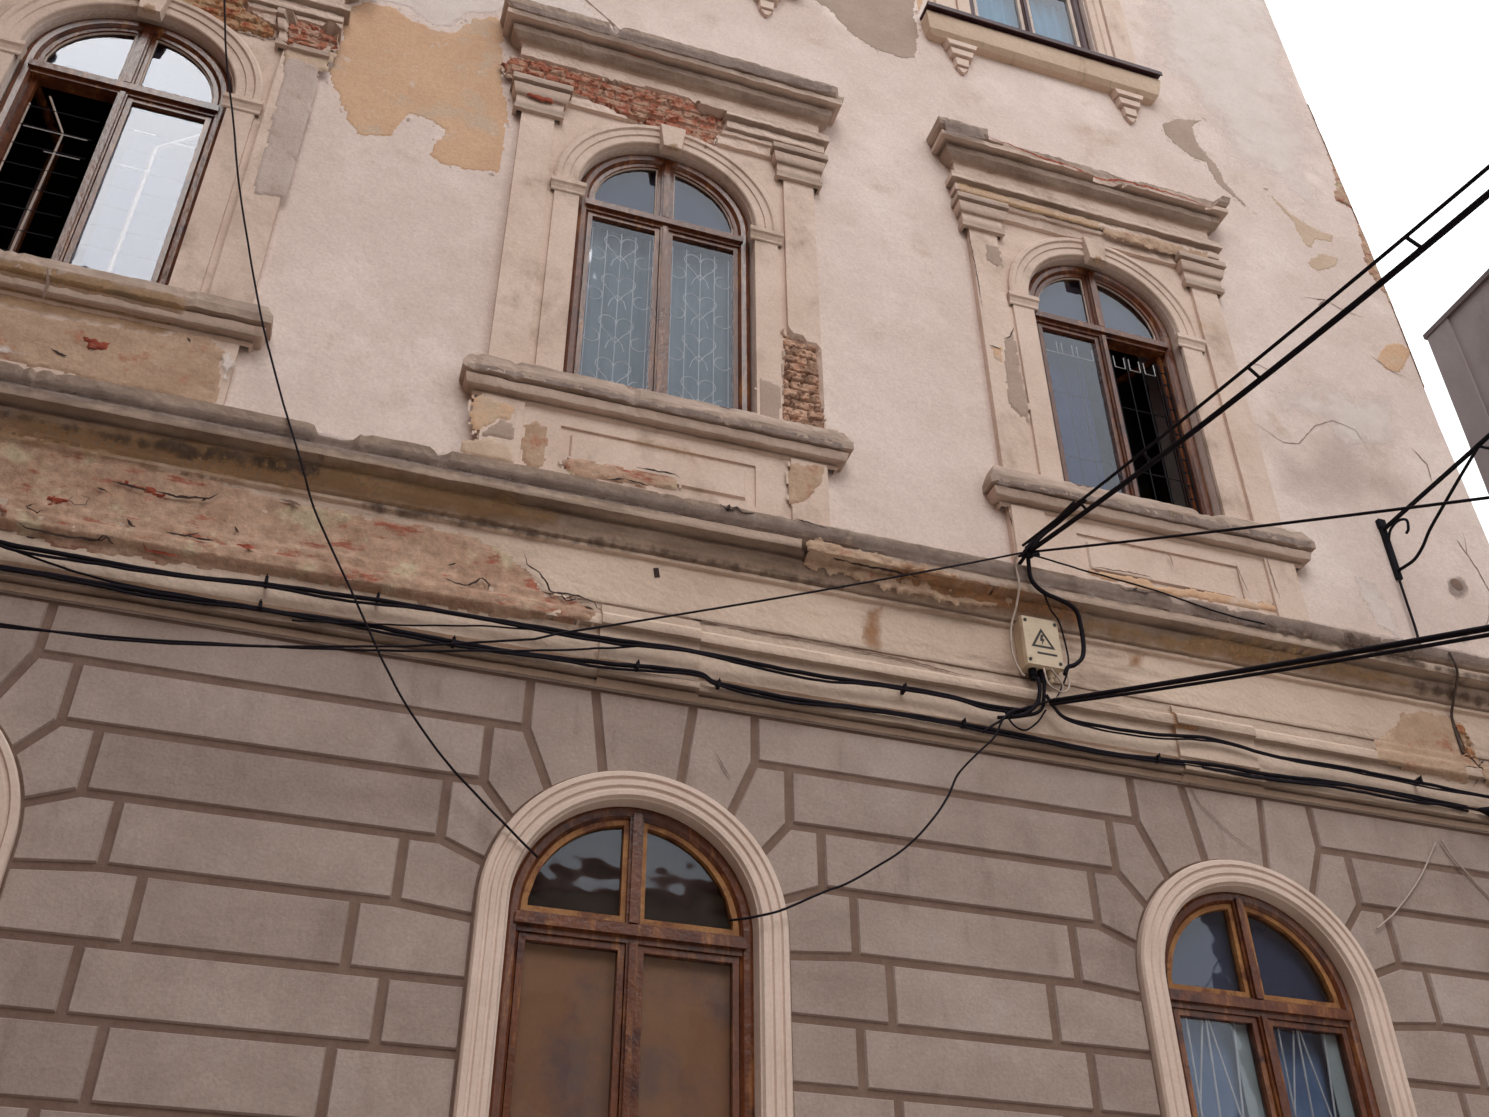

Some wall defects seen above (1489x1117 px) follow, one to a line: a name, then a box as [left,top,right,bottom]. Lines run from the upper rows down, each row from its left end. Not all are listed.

flaking render [811,0,923,59]
peeling [168,0,723,198]
flaking render [1161,117,1257,214]
flaking render [1307,104,1425,388]
flaking render [0,306,225,403]
flaking render [754,328,827,429]
crack [20,481,256,562]
flaking render [0,428,596,630]
flaking render [460,393,681,493]
water stain [0,364,1489,706]
flaking render [786,461,824,506]
flaking render [1374,711,1479,784]